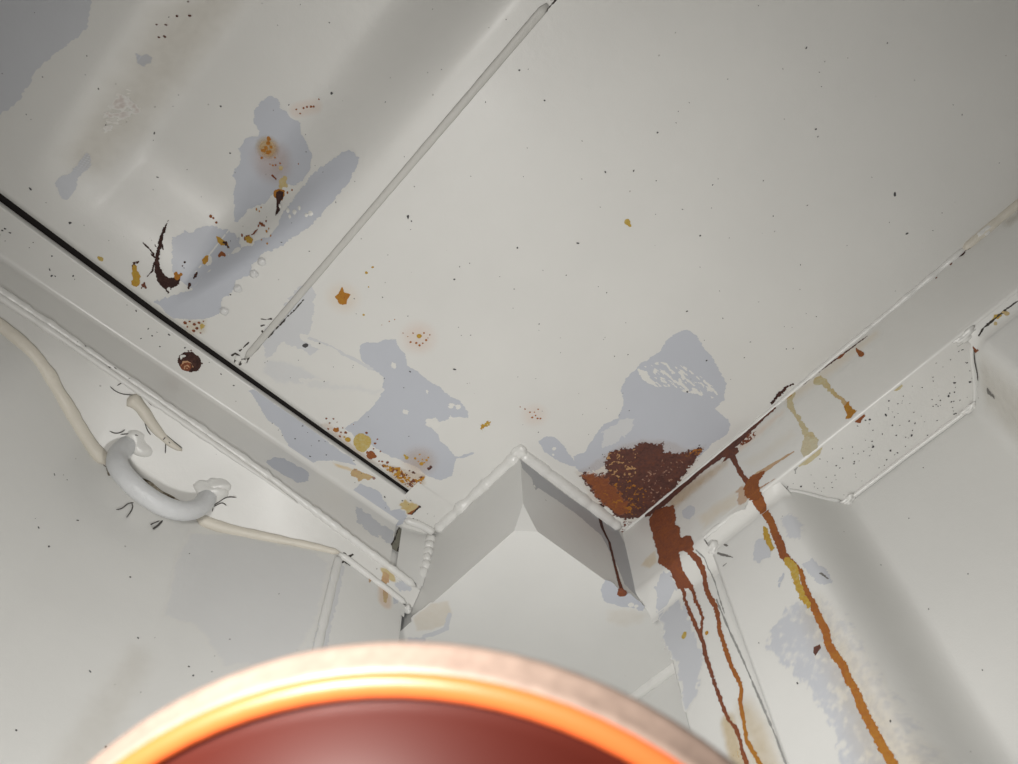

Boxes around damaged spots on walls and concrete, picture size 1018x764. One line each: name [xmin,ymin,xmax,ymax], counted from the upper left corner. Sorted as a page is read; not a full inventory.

peeling [0,0,92,115]
corrosion [131,261,147,289]
corrosion [202,236,230,266]
peeling [154,96,359,320]
corrosion [241,207,272,245]
corrosion [260,136,276,166]
corrosion [177,350,203,372]
peeling [308,337,474,480]
peeling [539,330,731,473]
corrosion [579,327,898,764]